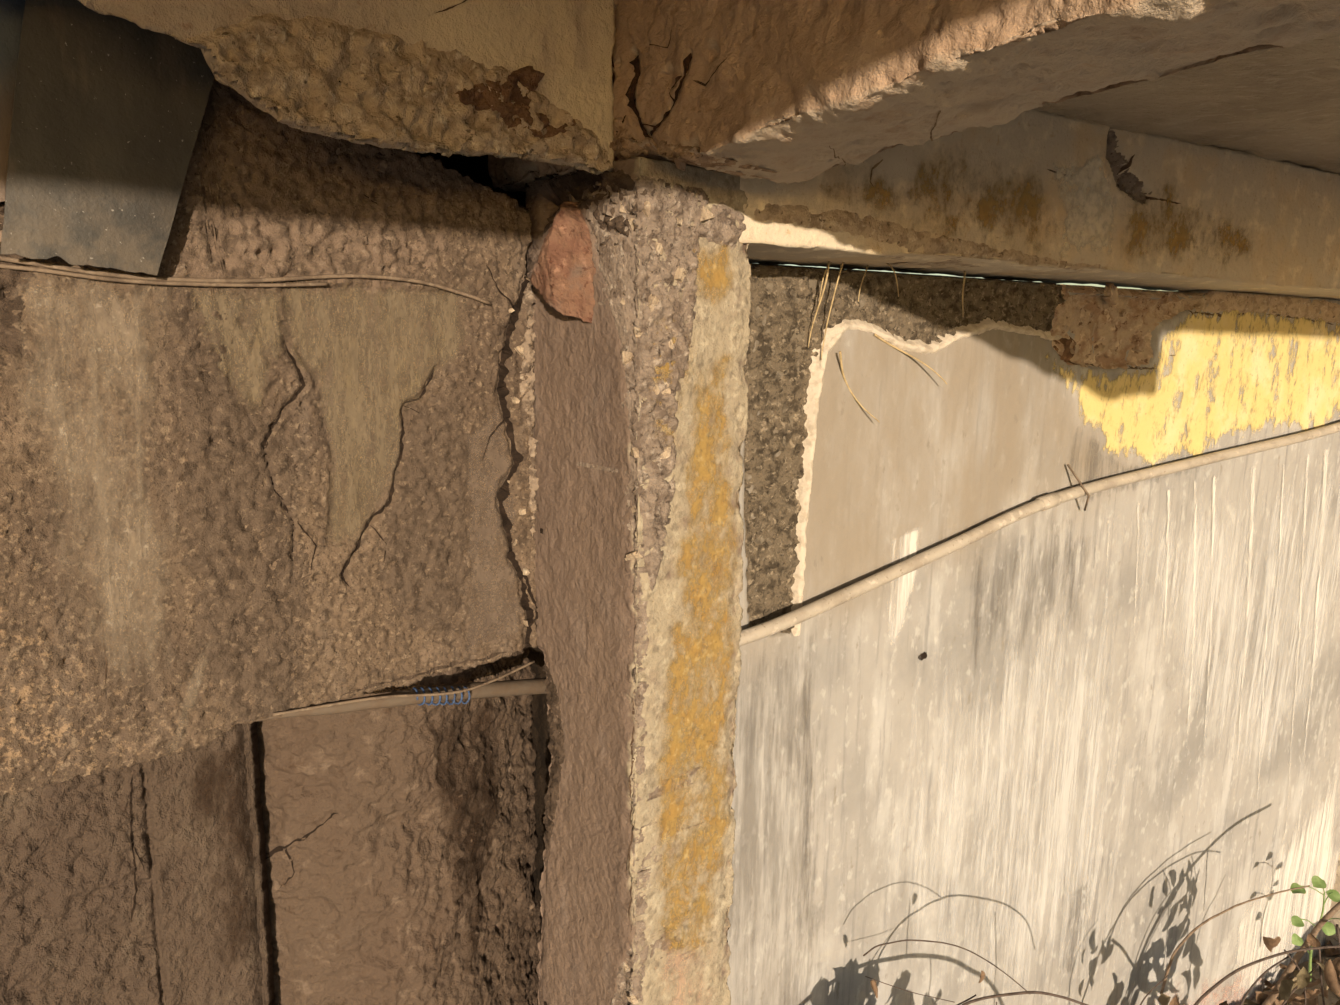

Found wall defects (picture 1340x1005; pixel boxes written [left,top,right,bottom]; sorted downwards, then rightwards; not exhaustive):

crack [930,111,941,141]
water stain [910,162,1043,241]
spalling [1106,129,1152,205]
crack [1117,155,1181,204]
water stain [1128,185,1194,256]
spalling [744,203,1340,628]
crack [262,340,435,588]
crack [483,265,538,647]
flaking render [780,623,801,636]
water stain [660,358,735,1005]
crack [266,813,338,889]